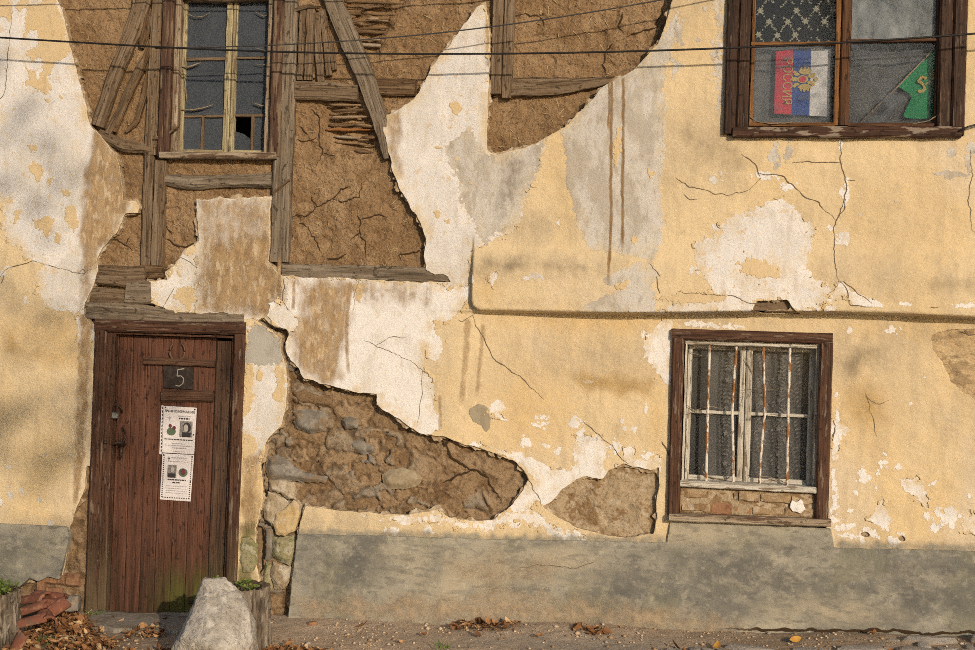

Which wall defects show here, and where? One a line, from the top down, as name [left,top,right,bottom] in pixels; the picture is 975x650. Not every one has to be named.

crack [0,11,13,99]
peeling [0,0,273,345]
peeling [933,141,975,180]
crack [679,139,872,307]
crack [1,260,92,283]
crack [652,267,777,305]
crack [367,336,429,423]
crack [459,315,536,392]
flaking render [931,329,975,399]
peeling [829,410,975,548]